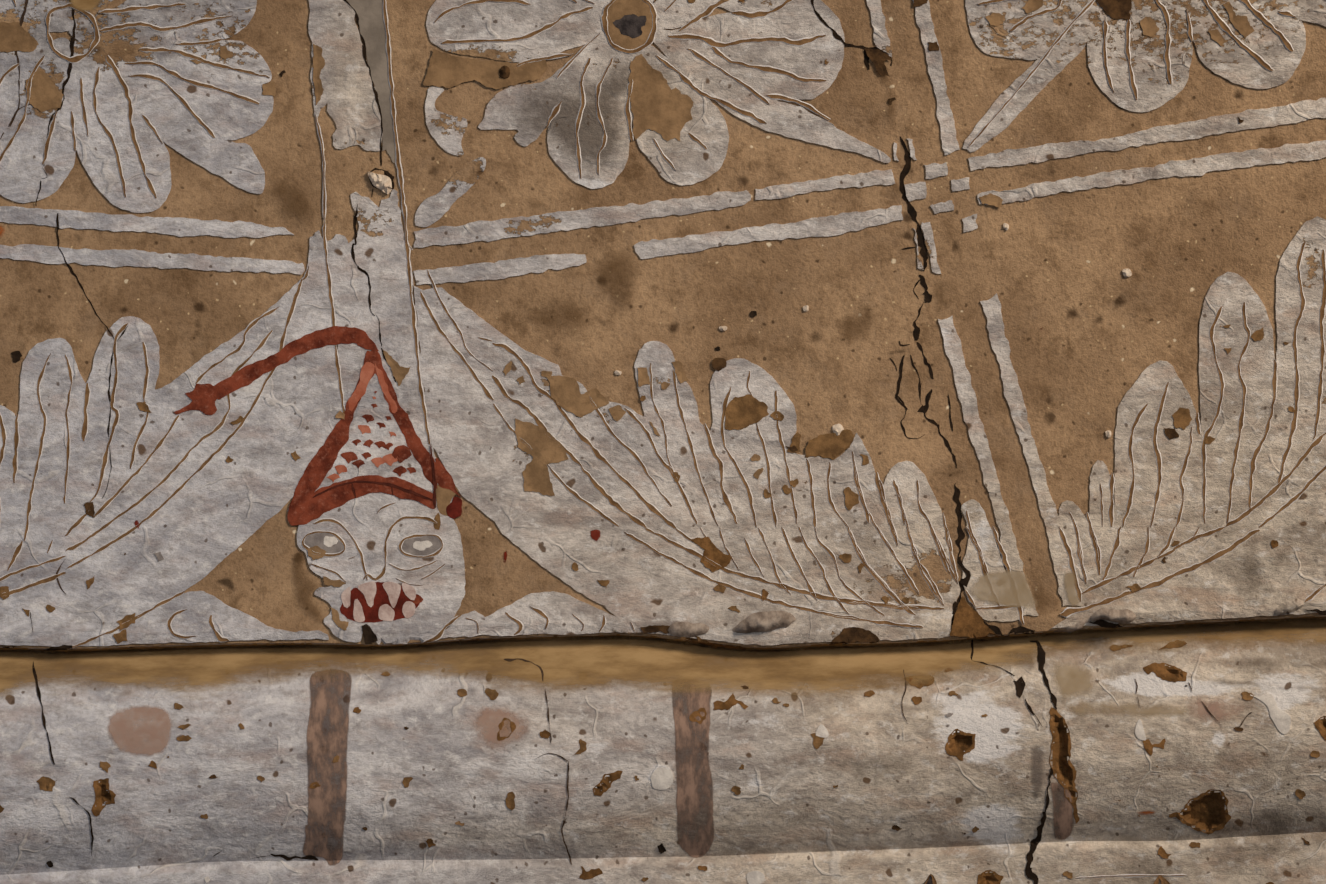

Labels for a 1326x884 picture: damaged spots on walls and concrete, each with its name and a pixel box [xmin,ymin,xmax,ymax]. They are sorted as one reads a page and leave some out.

crack [811,0,892,70]
flaking render [1097,0,1159,37]
crack [344,0,396,382]
crack [0,0,128,498]
flaking render [725,394,784,430]
flaking render [785,429,869,465]
crack [889,136,1057,726]
flaking render [908,668,953,705]
flaking render [1143,640,1187,687]
flaking render [945,713,976,761]
crack [1025,768,1053,884]
flaking render [1169,789,1231,848]